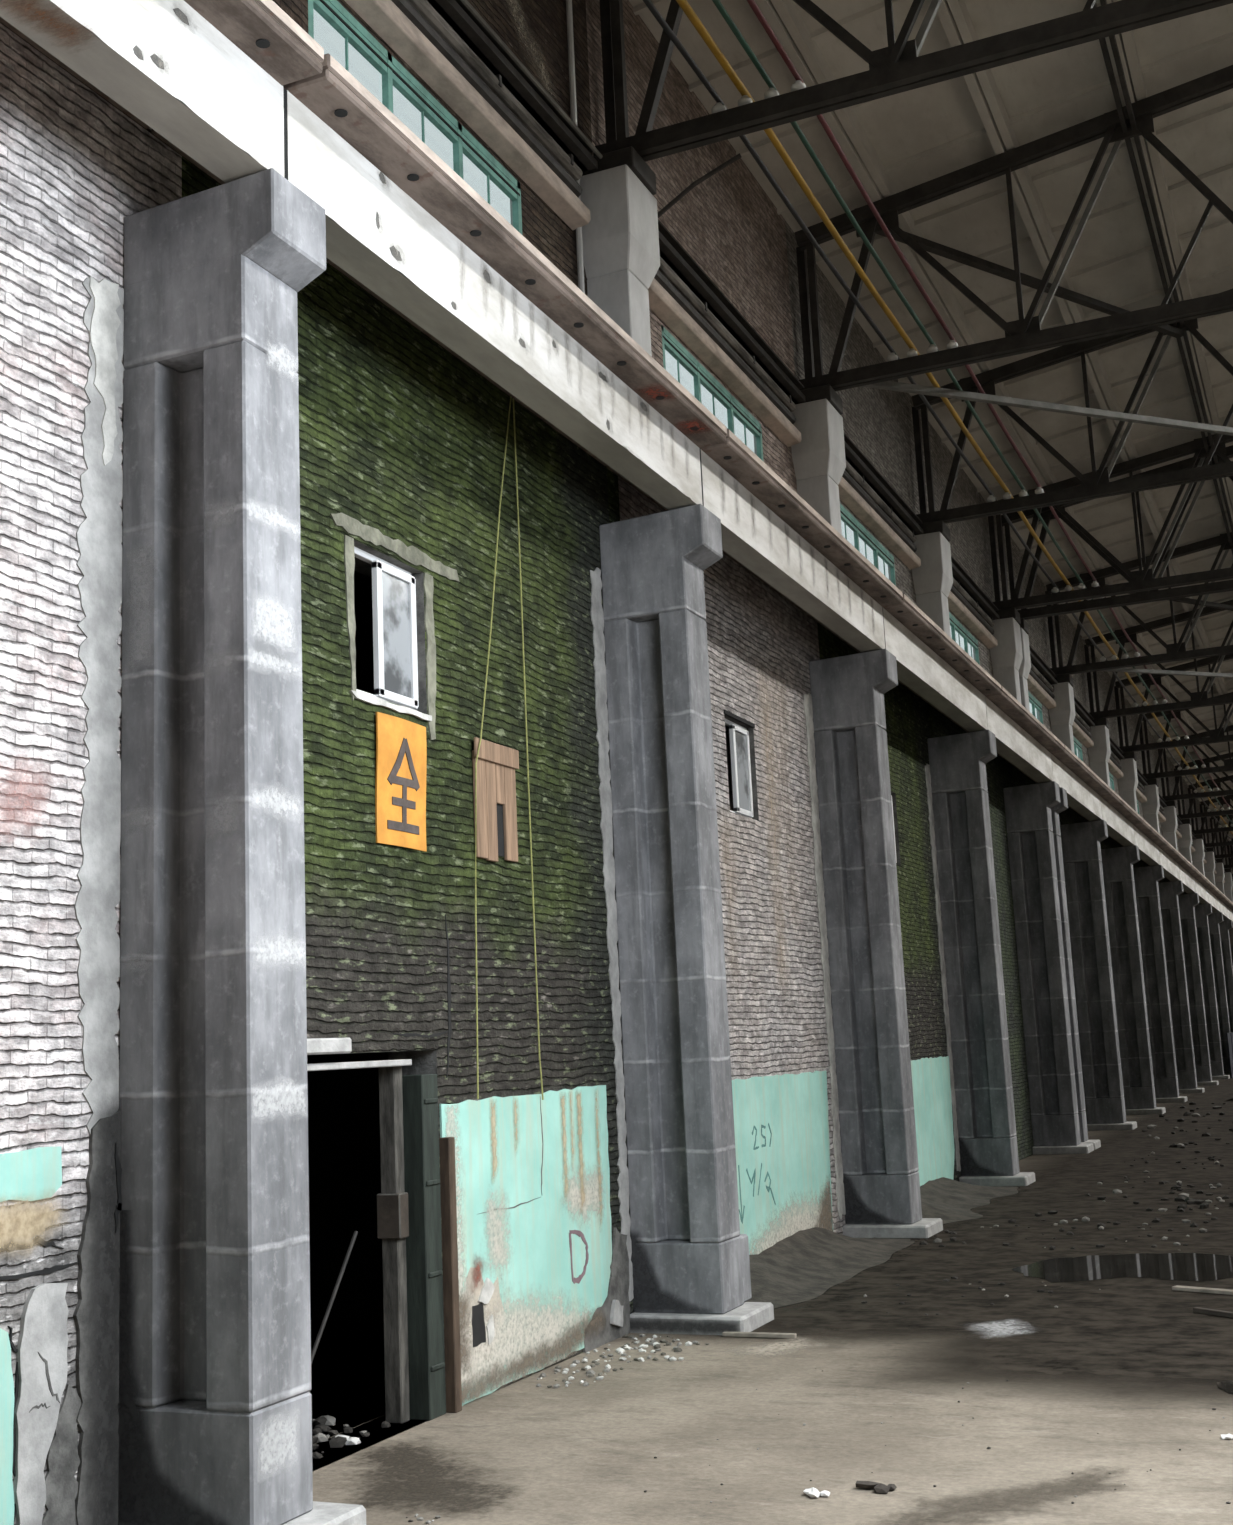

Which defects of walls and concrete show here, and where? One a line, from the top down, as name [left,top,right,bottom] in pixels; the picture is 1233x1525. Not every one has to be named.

peeling [446,567,634,1402]
crack [0,1236,79,1280]
crack [7,1326,60,1522]
peeling [0,1283,81,1525]